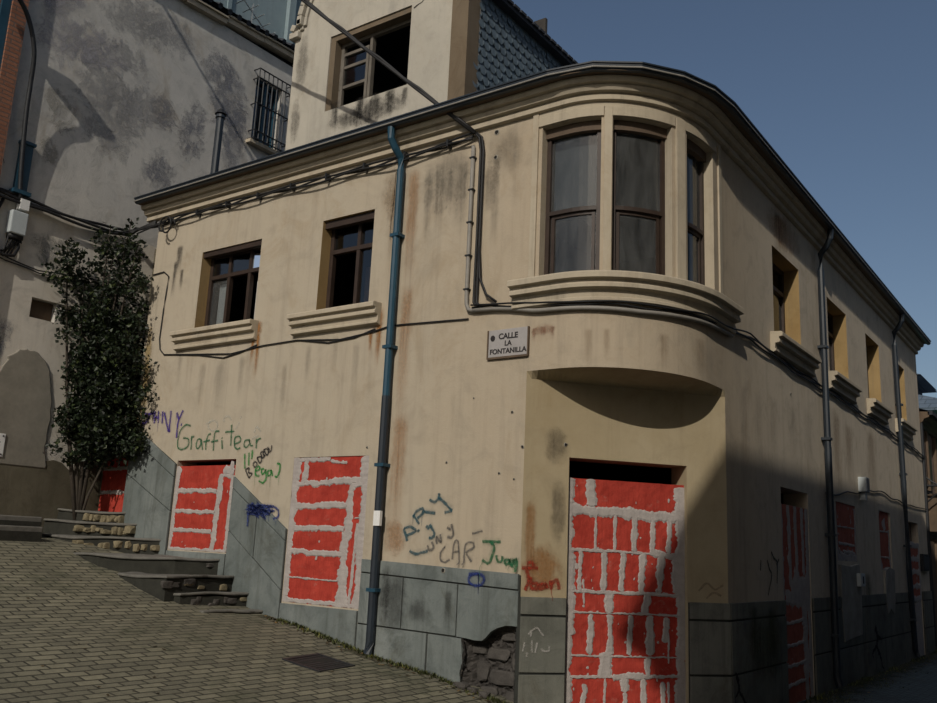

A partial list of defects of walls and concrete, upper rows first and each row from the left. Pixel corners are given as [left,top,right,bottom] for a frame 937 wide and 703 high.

leakage [333,91,392,123]
flaking render [473,632,516,702]